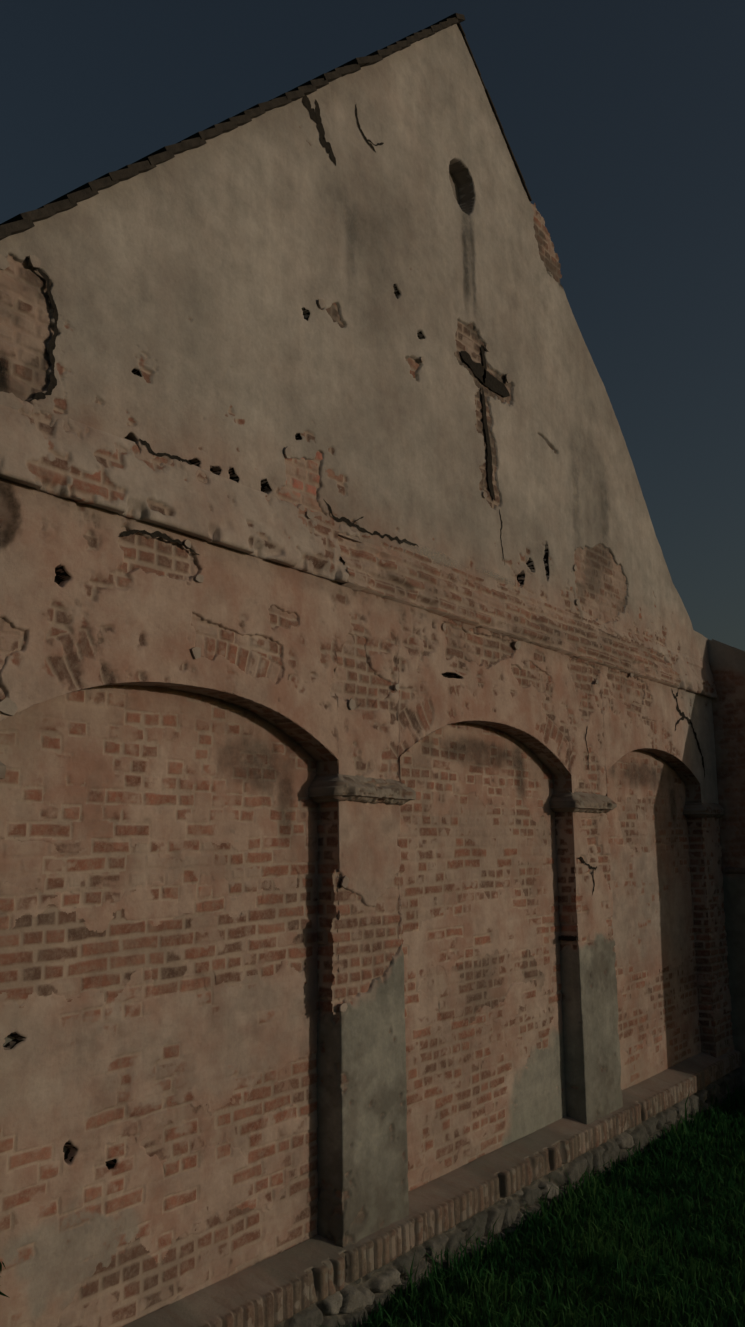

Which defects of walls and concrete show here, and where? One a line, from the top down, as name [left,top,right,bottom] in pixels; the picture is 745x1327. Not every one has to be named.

crack [302,95,336,166]
crack [355,105,384,153]
spalling [531,203,562,284]
spalling [0,253,54,410]
spalling [454,320,512,509]
spalling [188,459,239,482]
spalling [54,566,70,585]
spalling [118,527,204,585]
crack [324,500,419,547]
flaking render [573,544,627,623]
crack [672,690,705,778]
crack [578,857,597,895]